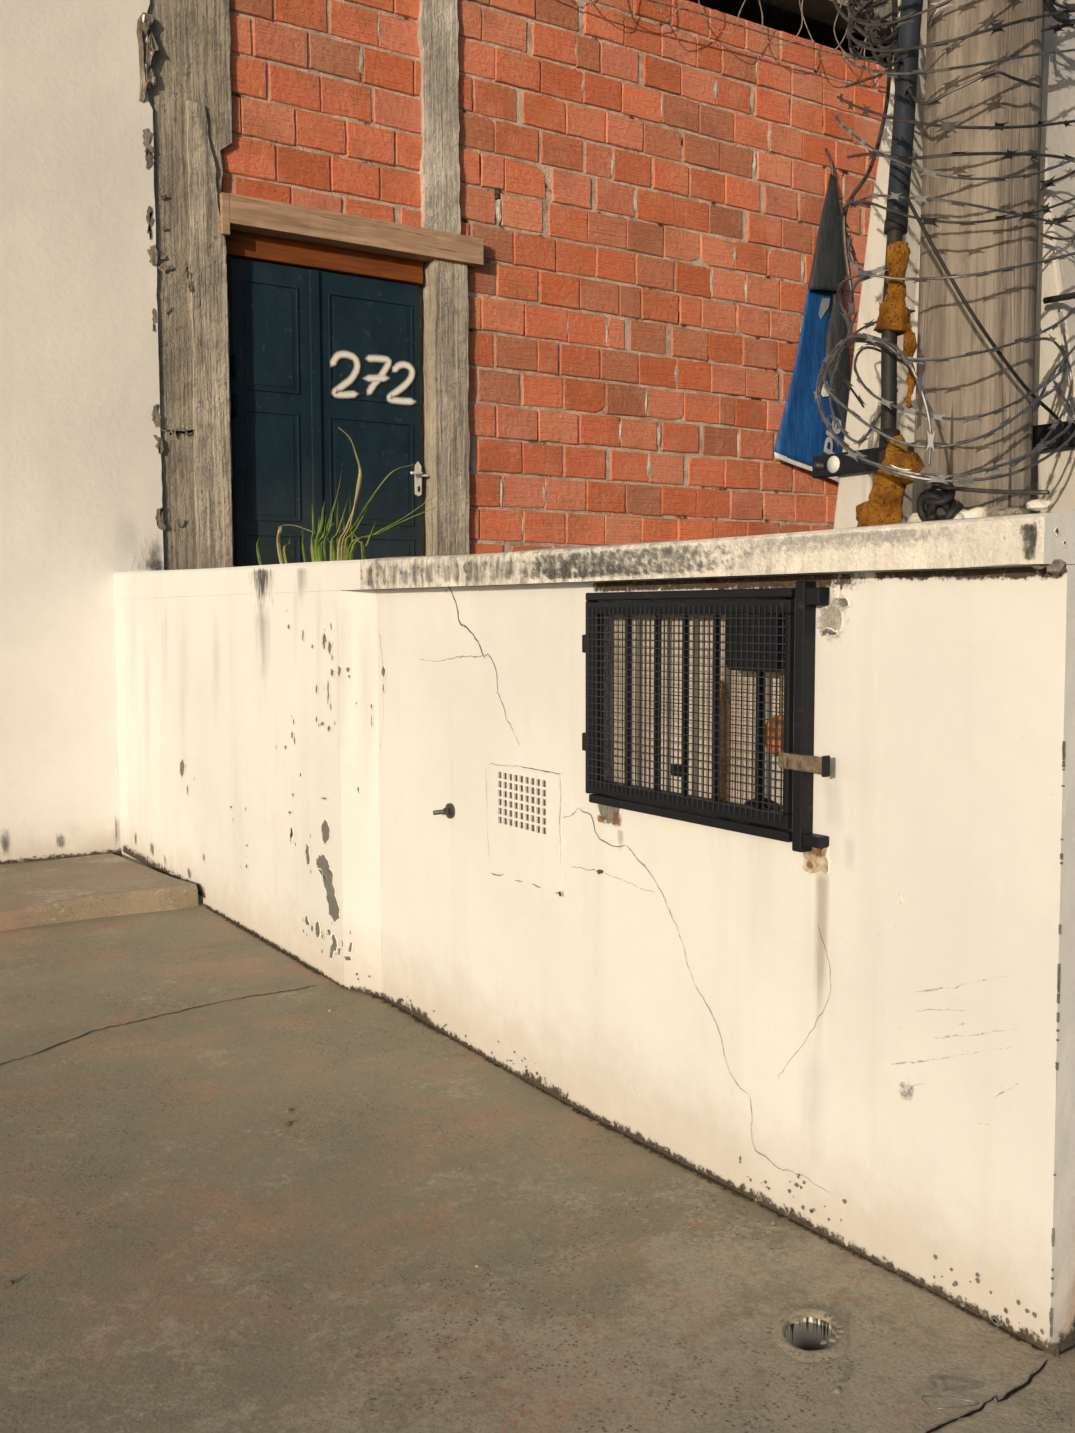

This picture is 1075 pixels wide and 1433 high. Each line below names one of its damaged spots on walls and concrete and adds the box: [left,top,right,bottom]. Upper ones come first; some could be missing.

water stain [360,524,1062,592]
peeling [286,610,351,733]
peeling [180,758,189,796]
peeling [288,773,370,989]
crack [422,587,823,1189]
rust [801,845,832,875]
crack [0,985,315,1065]
water stain [0,821,1075,1359]
crack [926,1359,1048,1433]